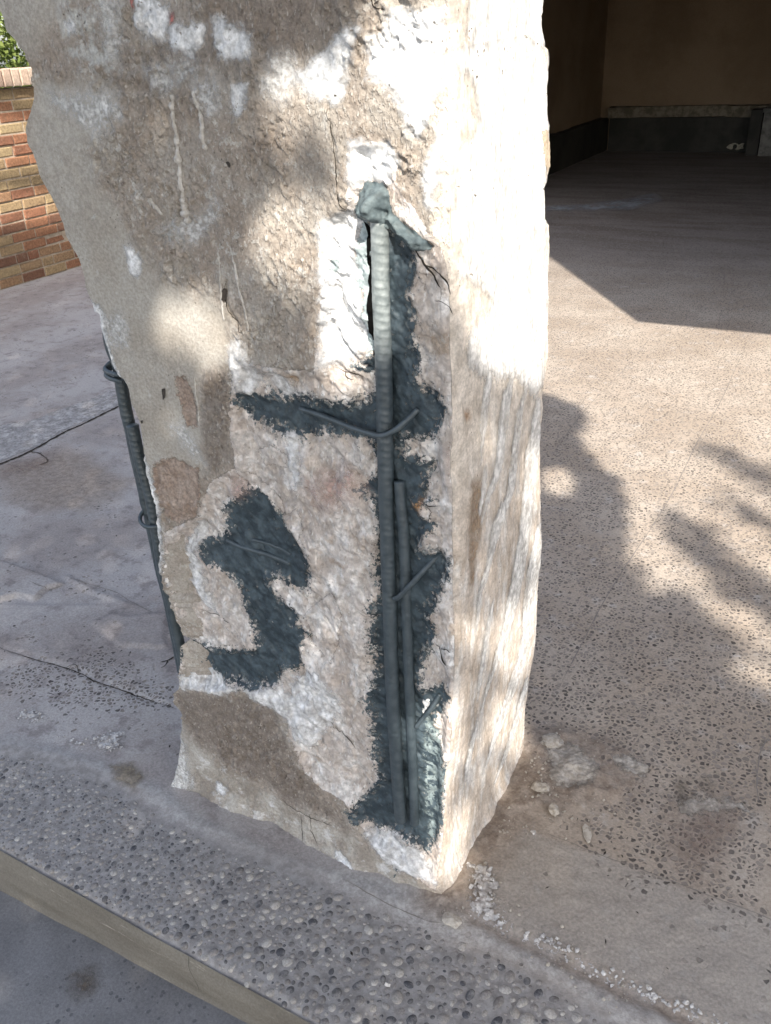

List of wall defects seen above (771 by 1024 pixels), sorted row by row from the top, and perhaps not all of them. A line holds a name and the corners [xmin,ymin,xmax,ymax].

crack [415,250,452,313]
crack [0,396,119,466]
spalling [93,0,550,891]